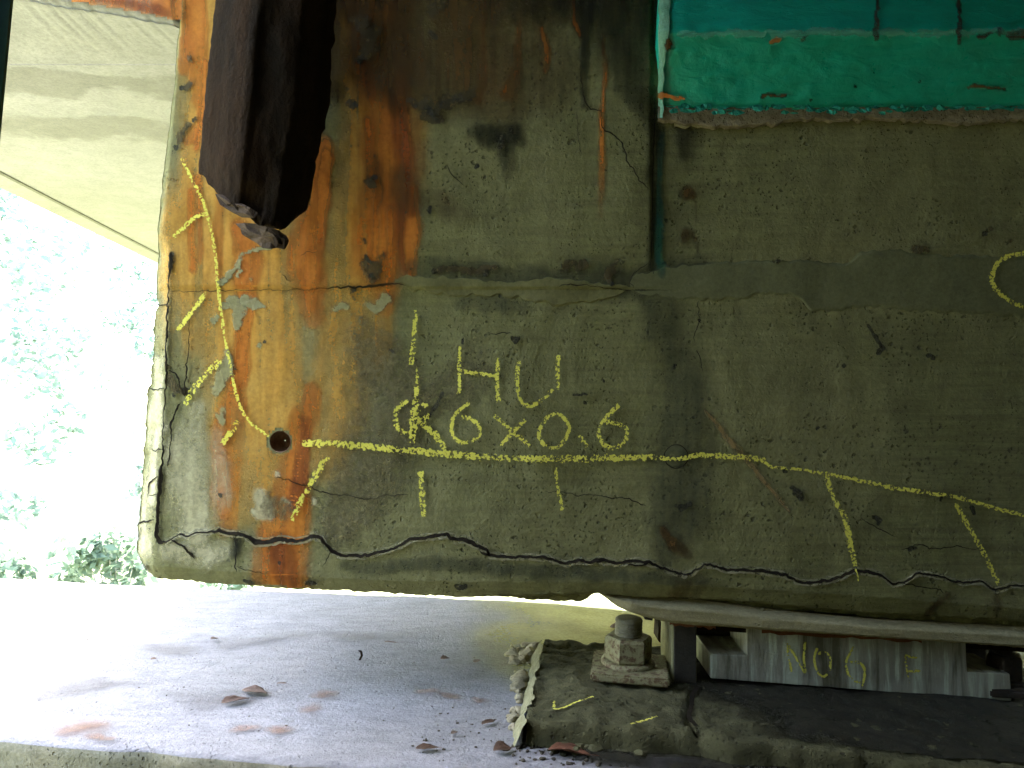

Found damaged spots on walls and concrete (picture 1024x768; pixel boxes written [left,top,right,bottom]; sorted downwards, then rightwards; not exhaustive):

corrosion [71,0,419,588]
damp [330,0,663,262]
crack [137,251,1024,594]
spalling [657,103,1024,130]